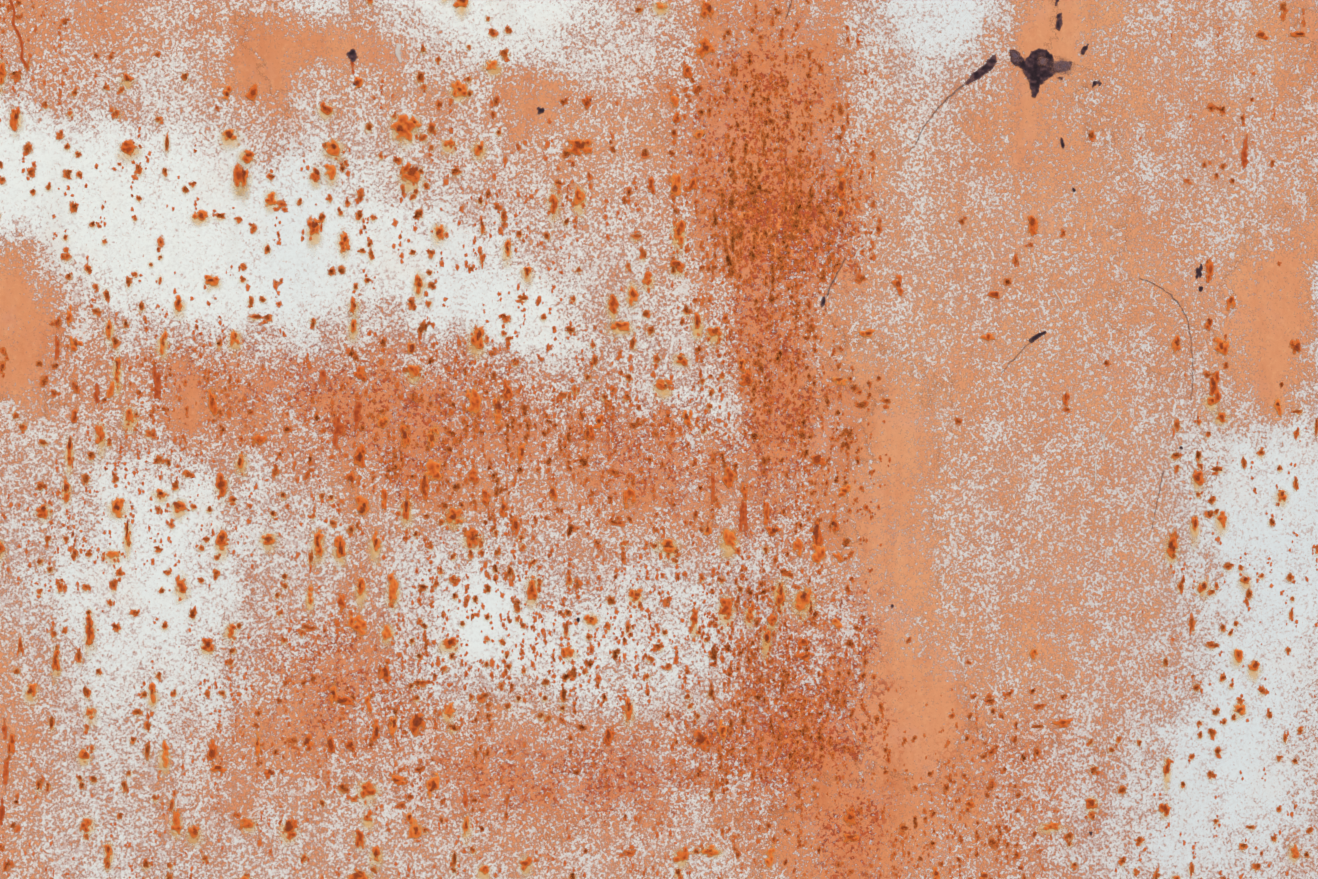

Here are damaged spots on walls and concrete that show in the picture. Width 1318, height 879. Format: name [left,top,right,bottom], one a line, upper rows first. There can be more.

rust [21,142,88,213]
rust [162,164,257,234]
rust [126,236,176,287]
rust [204,275,219,289]
rust [226,263,266,308]
rust [301,212,326,243]
rust [339,231,351,253]
rust [355,210,377,259]
rust [1265,462,1299,552]
rust [1224,553,1264,611]
rust [1234,649,1270,696]
rust [1180,686,1318,879]